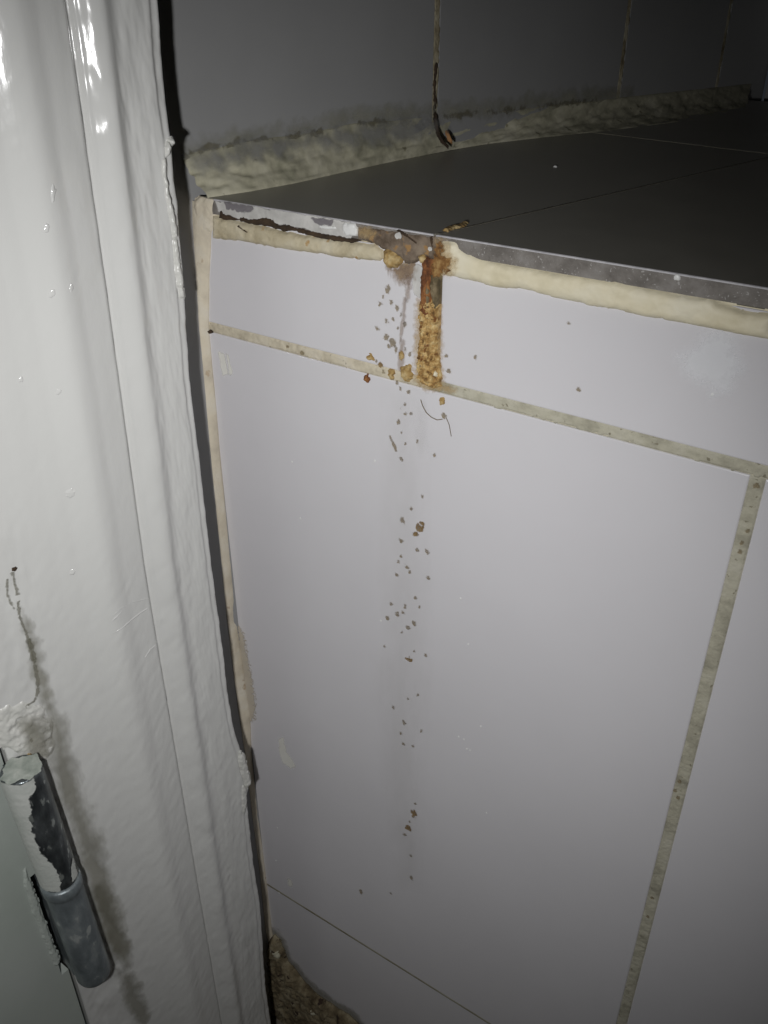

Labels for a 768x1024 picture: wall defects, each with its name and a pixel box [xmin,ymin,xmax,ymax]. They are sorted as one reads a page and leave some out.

rust [383,241,451,405]